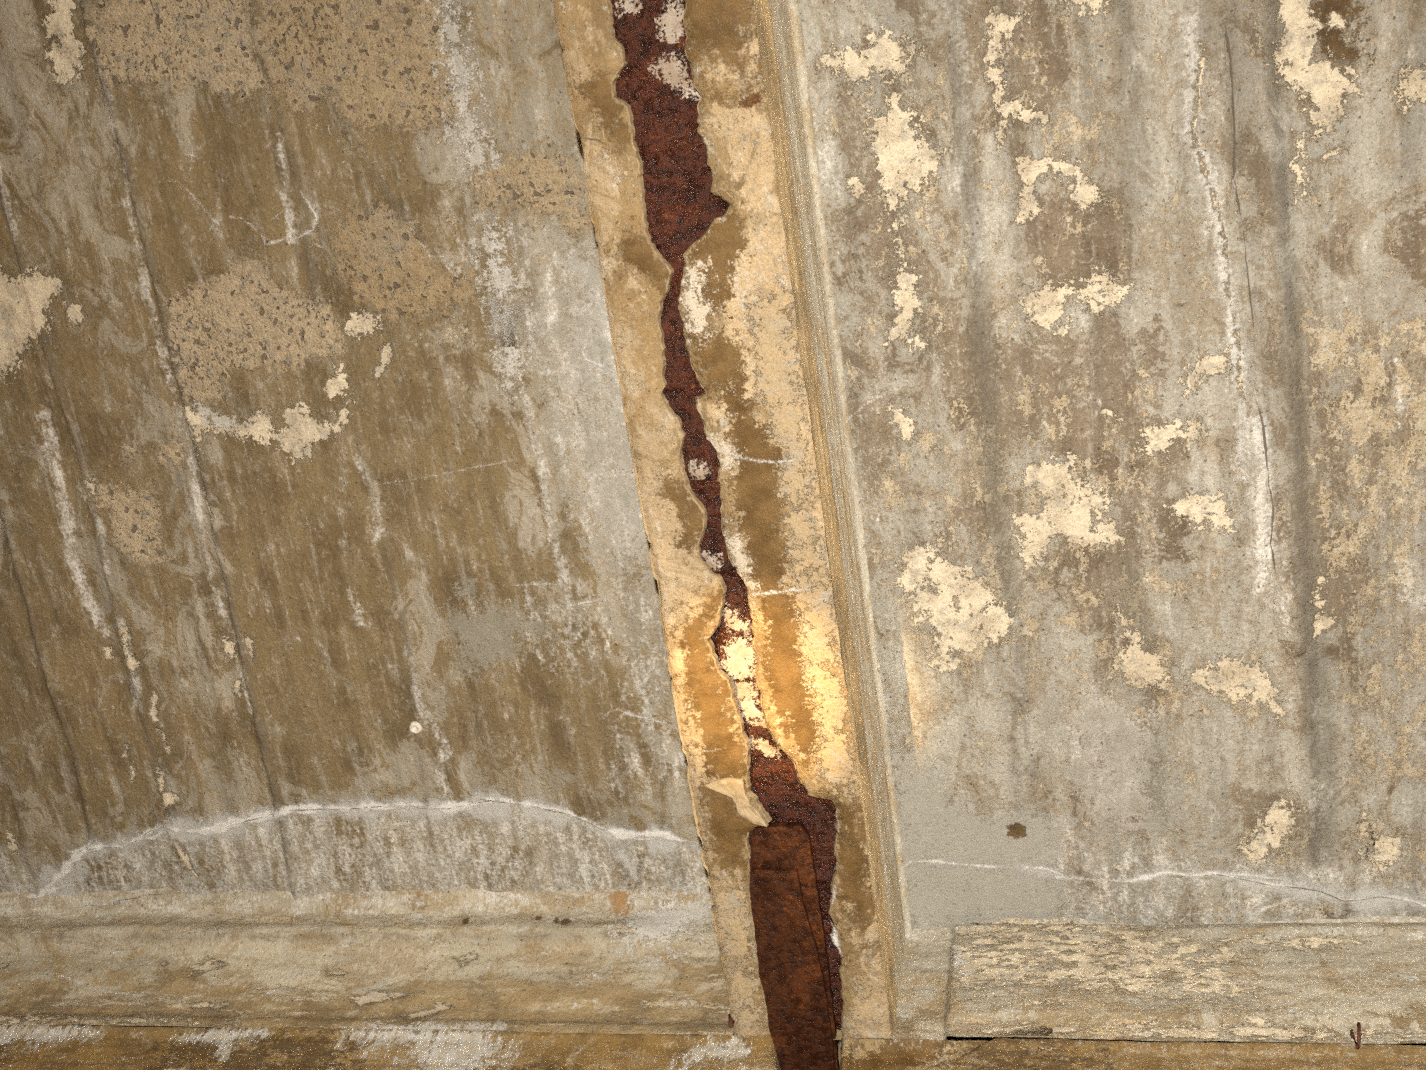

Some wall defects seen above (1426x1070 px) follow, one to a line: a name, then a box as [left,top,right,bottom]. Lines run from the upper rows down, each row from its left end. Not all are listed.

corrosion [739,93,762,108]
peeling [810,15,950,356]
peeling [977,0,1111,227]
peeling [1264,0,1369,207]
leakage [1307,0,1376,72]
peeling [0,263,88,385]
peeling [1015,265,1136,338]
spalling [605,0,857,1070]
peeling [893,531,1017,678]
peeling [1007,451,1134,580]
leakage [1035,671,1185,857]
corrosion [606,890,635,920]